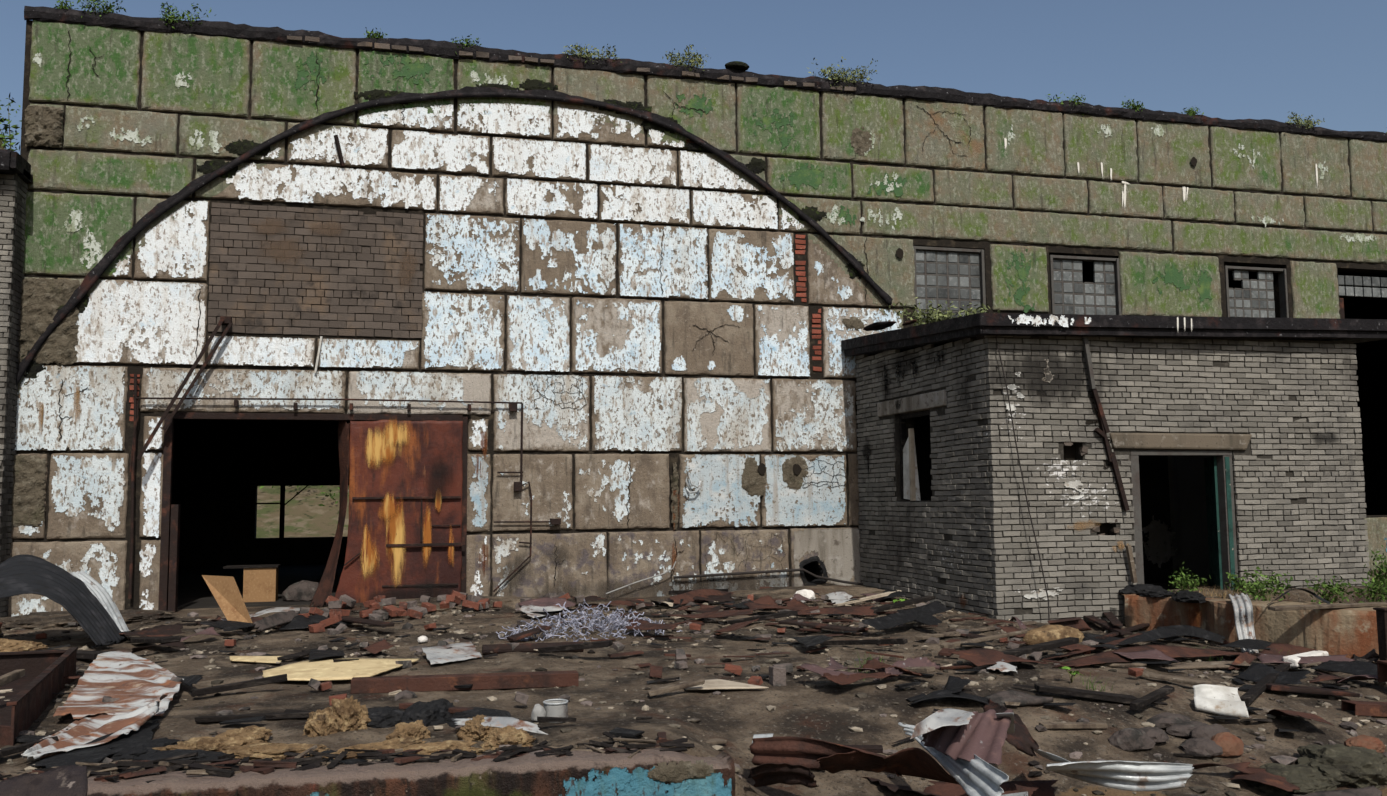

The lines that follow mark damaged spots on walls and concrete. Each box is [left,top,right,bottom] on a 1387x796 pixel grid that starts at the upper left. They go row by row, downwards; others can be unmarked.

peeling [175,70,192,89]
peeling [471,70,513,86]
peeling [675,92,713,117]
leakage [1101,162,1130,207]
peeling [0,103,907,656]
corrosion [366,422,409,465]
corrosion [362,494,404,582]
corrosion [423,493,441,563]
spalling [674,617,701,669]
spalling [308,678,347,706]
spalling [724,663,800,686]